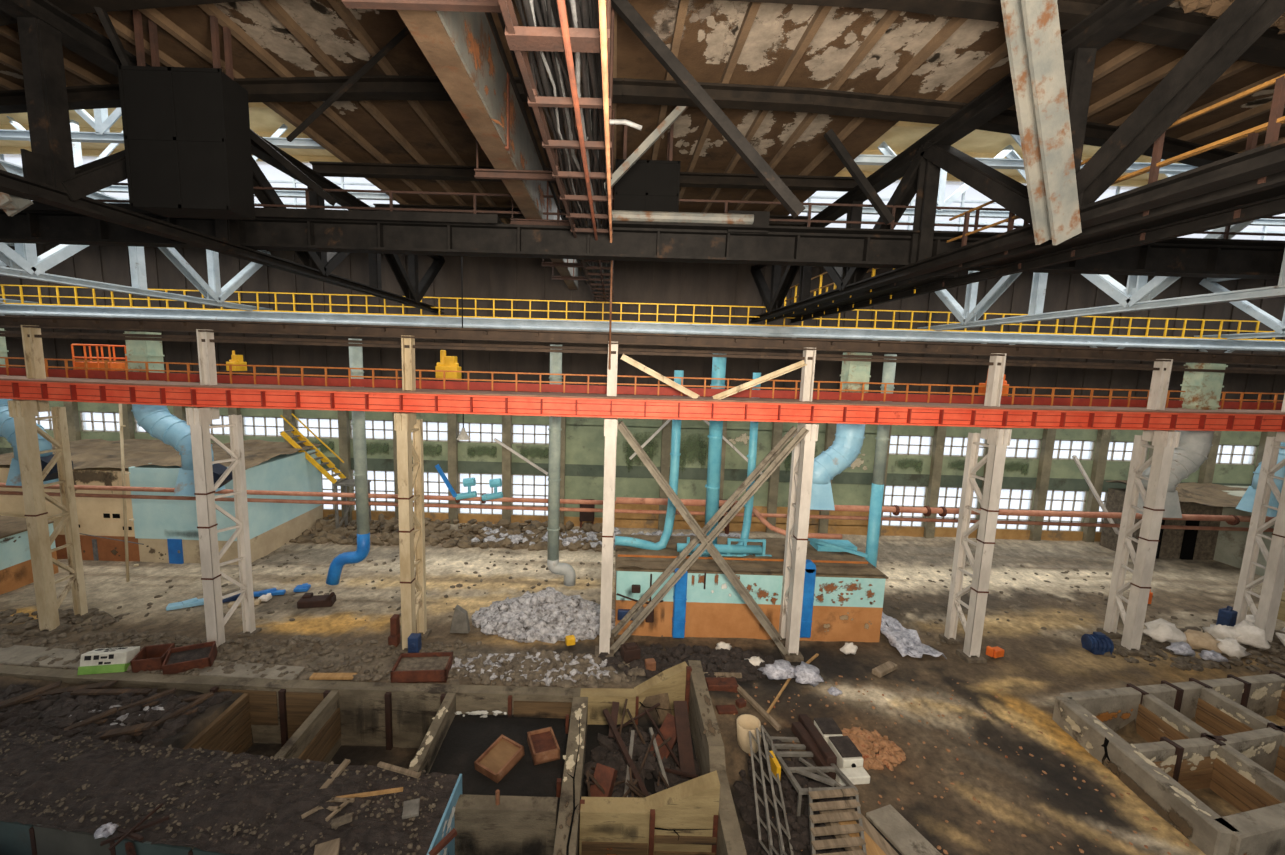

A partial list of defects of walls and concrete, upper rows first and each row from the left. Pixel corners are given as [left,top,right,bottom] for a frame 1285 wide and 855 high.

peeling [215,0,380,77]
peeling [653,0,1009,94]
spalling [1169,0,1235,19]
spalling [1269,14,1285,34]
peeling [661,110,832,157]
corrosion [736,575,778,605]
corrosion [814,580,875,606]